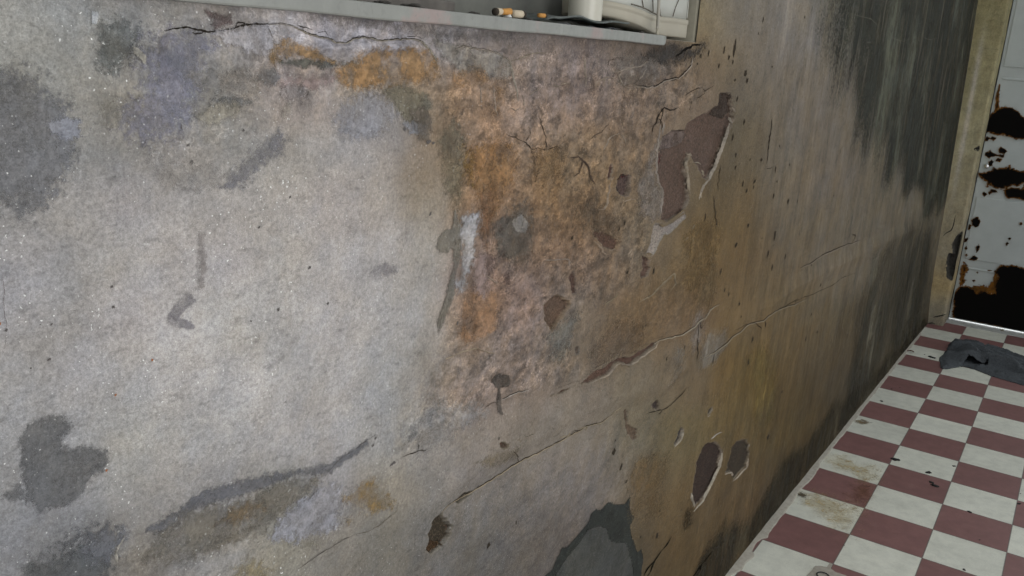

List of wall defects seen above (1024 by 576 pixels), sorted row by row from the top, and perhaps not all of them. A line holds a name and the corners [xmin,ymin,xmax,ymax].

crack [165,22,519,101]
corrosion [269,38,442,90]
crack [607,44,709,132]
crack [511,119,608,185]
spalling [594,70,749,302]
corrosion [978,84,1024,201]
damp [693,0,978,576]
corrosion [952,217,1024,331]
damp [3,415,108,512]
damp [142,439,368,563]
spalling [421,486,476,559]
spalling [689,432,752,511]